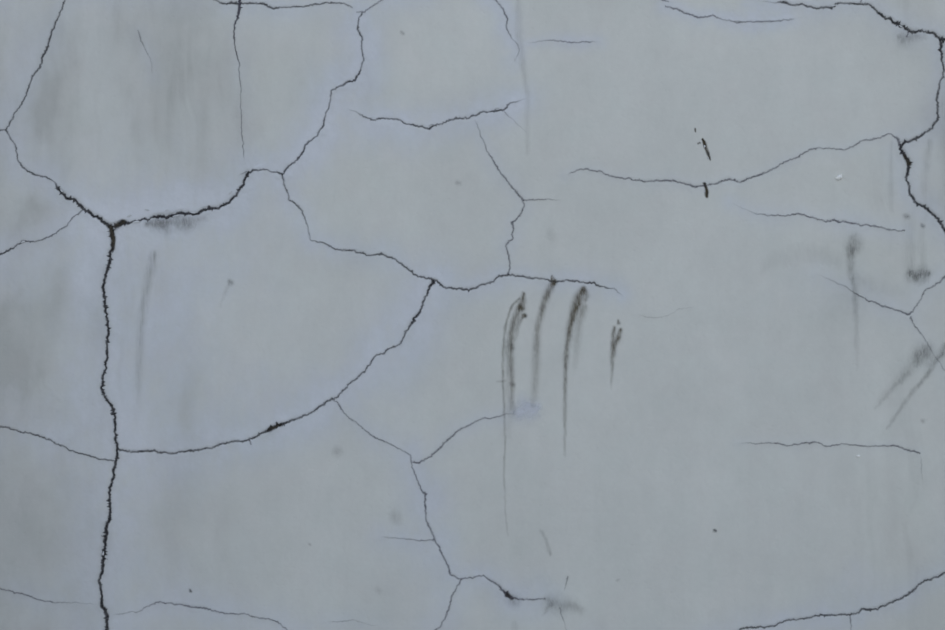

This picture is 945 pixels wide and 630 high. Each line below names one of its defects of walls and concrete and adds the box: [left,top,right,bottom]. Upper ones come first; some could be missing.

crack [771,1,945,232]
crack [0,0,600,630]
leakage [567,288,585,336]
crack [740,572,945,630]